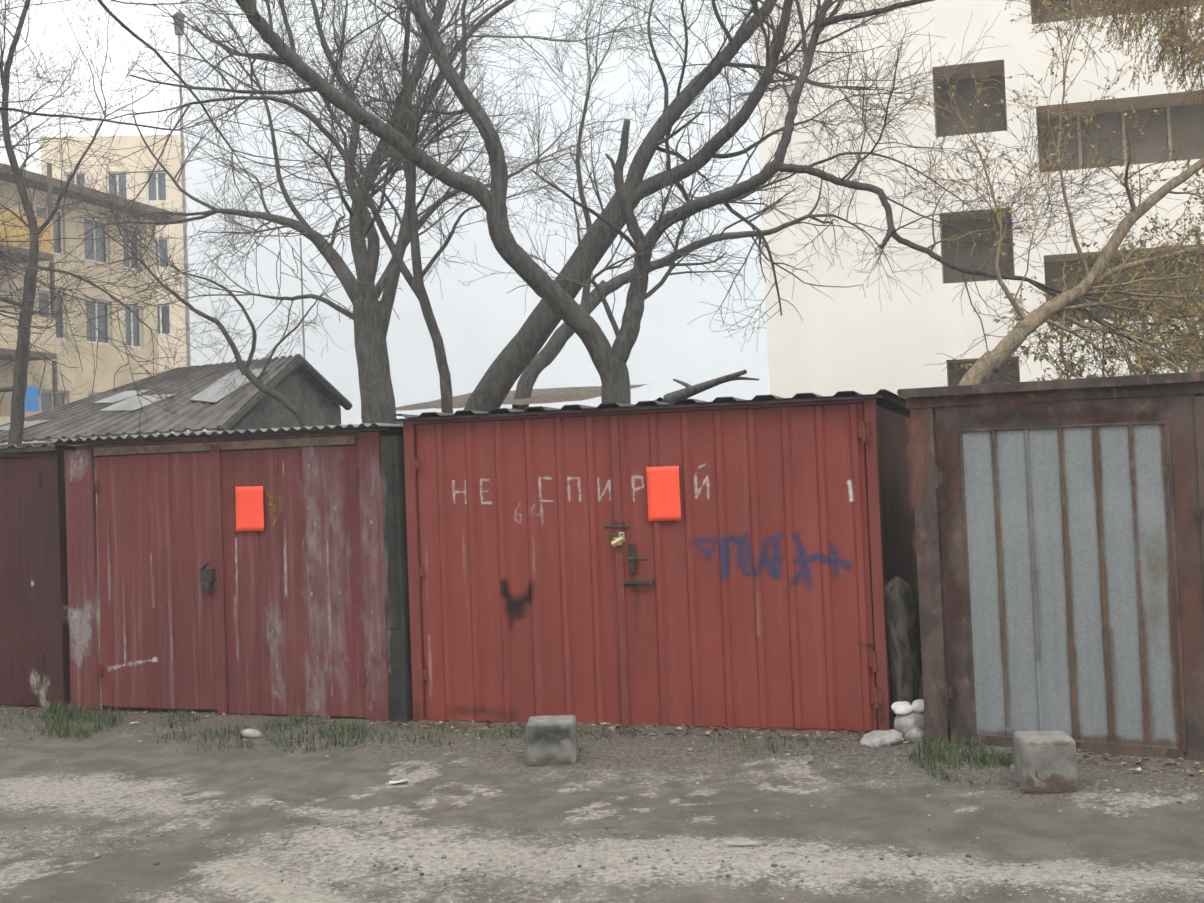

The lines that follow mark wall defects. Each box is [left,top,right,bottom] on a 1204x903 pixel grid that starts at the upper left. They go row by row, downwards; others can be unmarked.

peeling [30,670,50,708]
peeling [68,604,92,667]
peeling [298,446,340,711]
corrosion [907,390,1182,748]